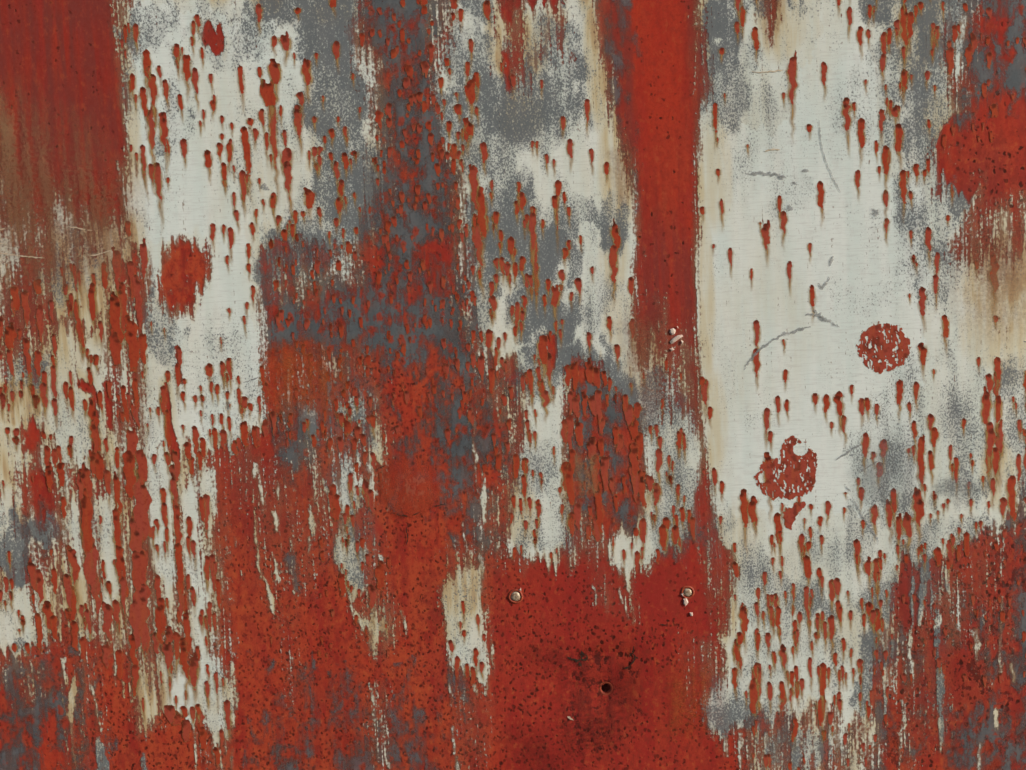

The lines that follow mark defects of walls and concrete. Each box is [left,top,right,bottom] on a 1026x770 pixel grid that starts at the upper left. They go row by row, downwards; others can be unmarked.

rust [0,14,400,767]
peeling [0,0,407,770]
rust [448,595,486,684]
rust [359,0,696,574]
rust [702,467,725,498]
peeling [428,0,1026,770]
rust [734,0,759,58]
rust [759,195,788,257]
rust [782,50,798,125]
rust [731,320,1026,745]
rust [837,0,998,240]
rust [908,226,950,348]